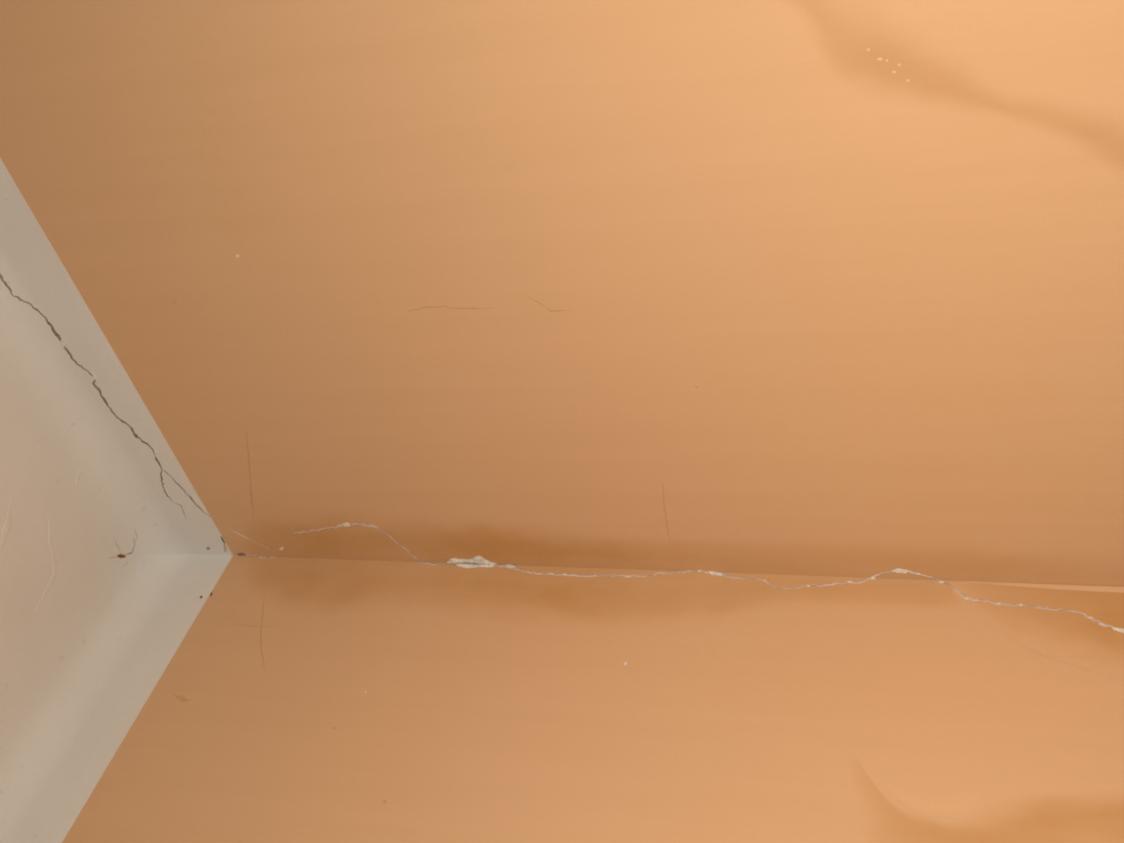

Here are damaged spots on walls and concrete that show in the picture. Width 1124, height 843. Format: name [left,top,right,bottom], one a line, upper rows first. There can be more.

crack [0,274,448,566]
crack [496,481,1124,633]